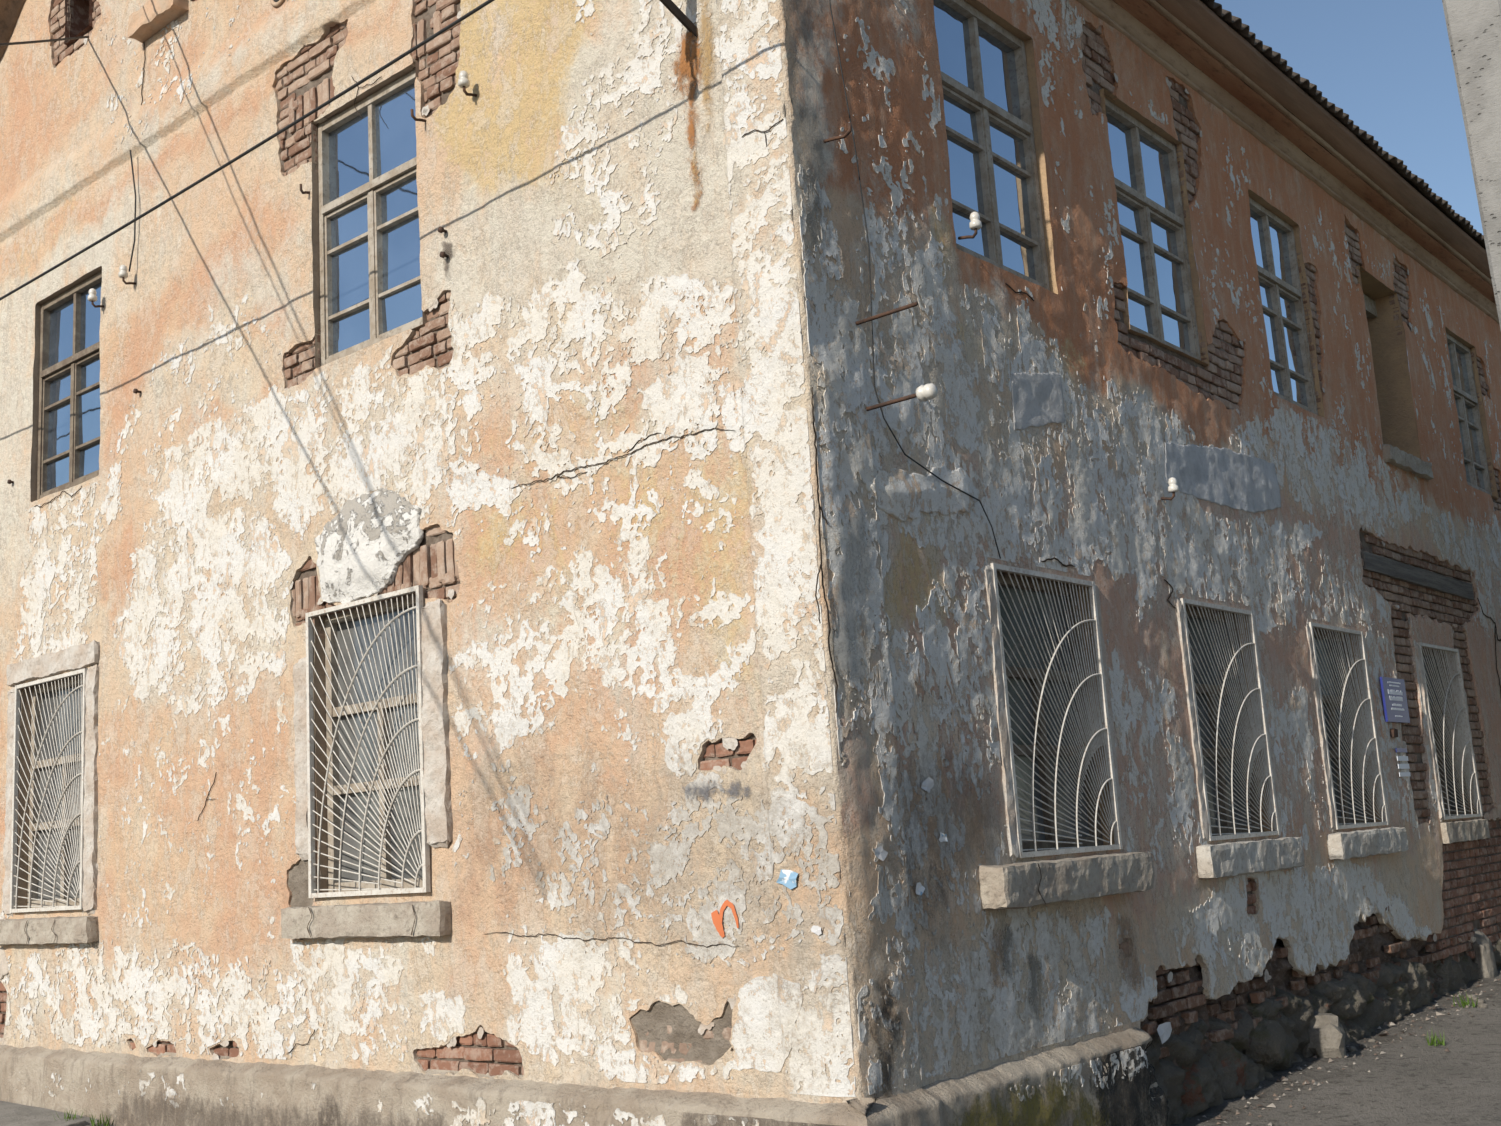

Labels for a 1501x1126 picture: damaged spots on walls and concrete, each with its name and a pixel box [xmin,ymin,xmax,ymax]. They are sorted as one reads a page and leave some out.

spalling [50,0,255,151]
spalling [275,23,348,176]
spalling [411,0,461,118]
peeling [545,0,703,262]
corrosion [674,2,713,210]
spalling [1083,77,1263,415]
crack [513,428,735,488]
crack [811,387,838,713]
peeling [225,731,321,907]
crack [487,932,738,947]
damp [957,1042,1169,1126]
peeling [1053,1046,1148,1096]